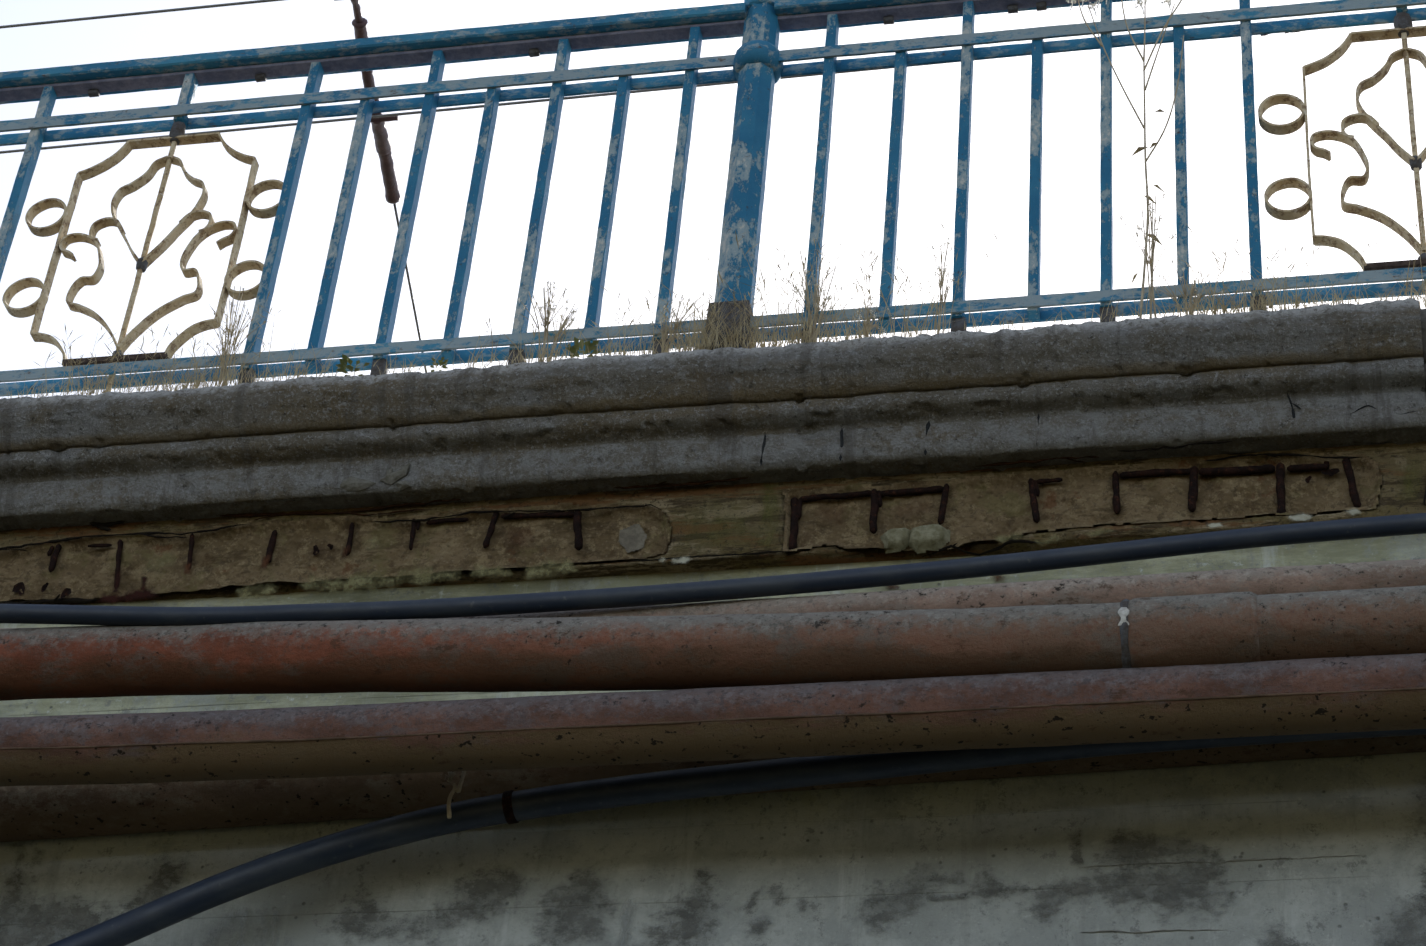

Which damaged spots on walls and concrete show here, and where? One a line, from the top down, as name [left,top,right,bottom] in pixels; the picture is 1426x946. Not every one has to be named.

crack [975,414,1361,467]
crack [1287,393,1313,420]
crack [1347,401,1417,415]
spalling [783,451,1382,554]
rust [100,568,155,604]
spalling [0,503,672,601]
damp [0,858,184,946]
damp [333,868,521,938]
damp [536,874,633,946]
damp [647,870,716,946]
damp [862,832,1224,930]